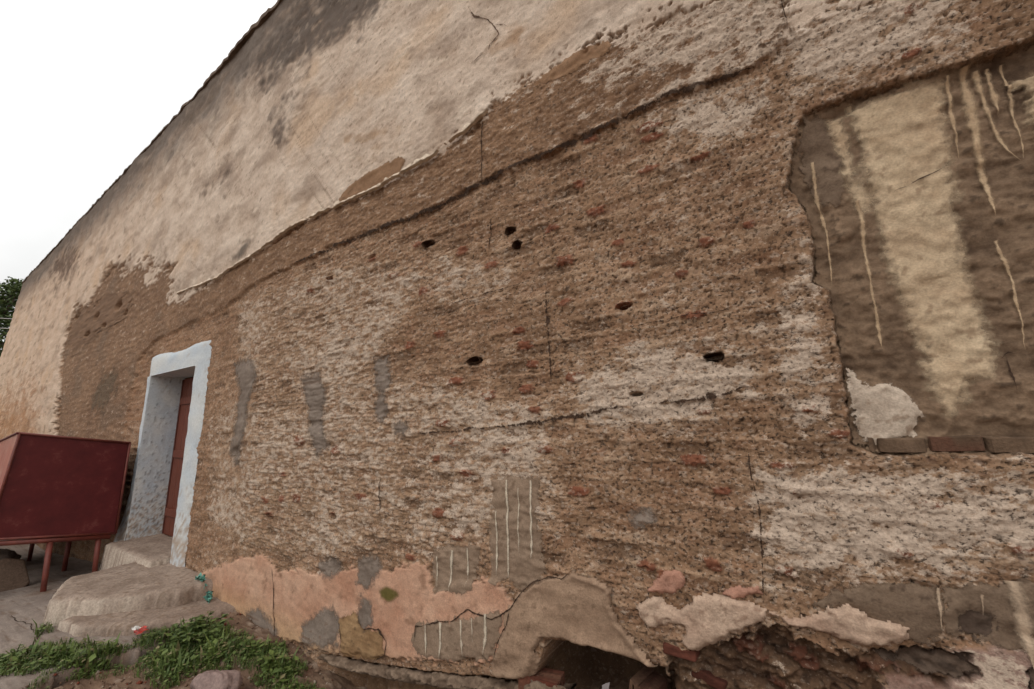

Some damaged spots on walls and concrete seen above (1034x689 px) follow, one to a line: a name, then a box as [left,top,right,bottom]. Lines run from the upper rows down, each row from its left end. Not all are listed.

crack [470,10,505,64]
leakage [972,65,1024,159]
peeling [176,109,488,295]
crack [296,68,751,262]
leakage [811,162,832,285]
leakage [855,200,882,346]
spalling [64,287,135,357]
crack [421,406,623,434]
crack [659,386,750,404]
spalling [874,644,984,679]
spalling [958,610,999,643]
leakage [1005,580,1034,668]